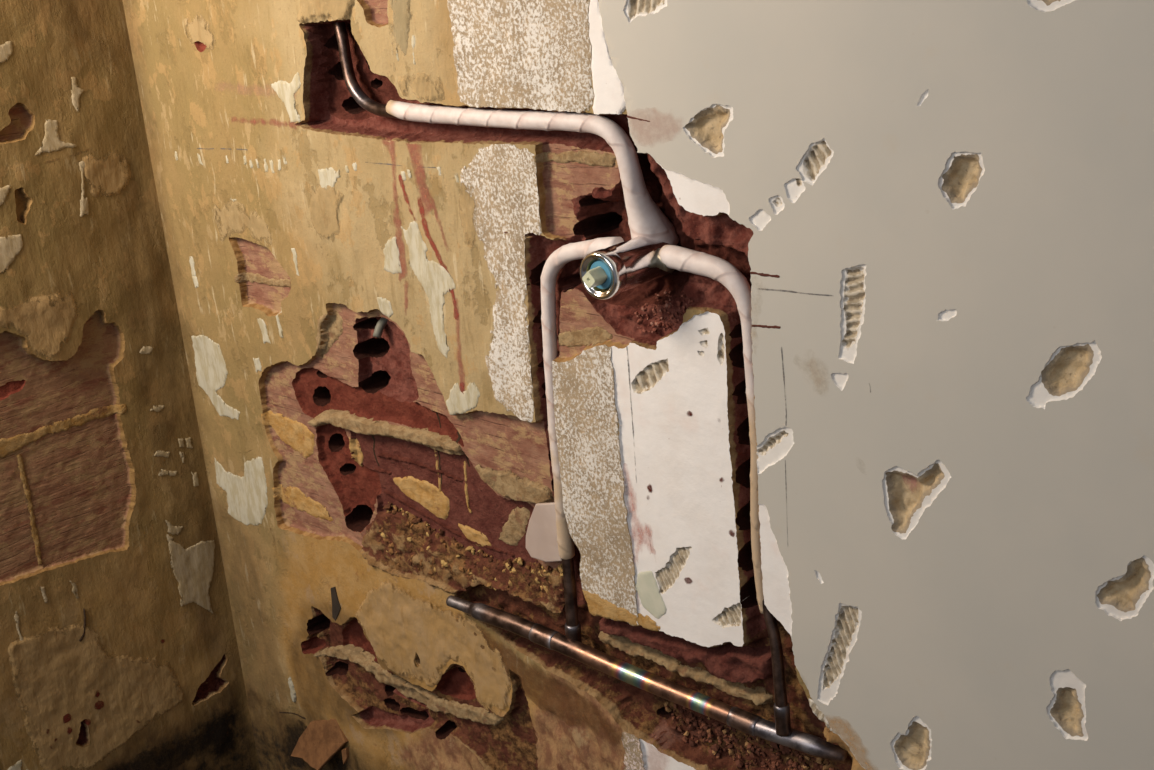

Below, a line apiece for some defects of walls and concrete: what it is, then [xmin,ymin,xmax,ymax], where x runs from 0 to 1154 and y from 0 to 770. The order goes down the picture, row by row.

flaking render [682,104,733,158]
flaking render [533,143,632,241]
spalling [634,144,751,278]
flaking render [938,151,985,209]
peeling [383,221,456,358]
flaking render [553,269,709,362]
flaking render [1026,340,1102,409]
flaking render [0,291,136,603]
flaking render [214,297,565,770]
flaking render [882,460,951,540]
leakage [47,691,104,741]
leakage [283,721,307,767]